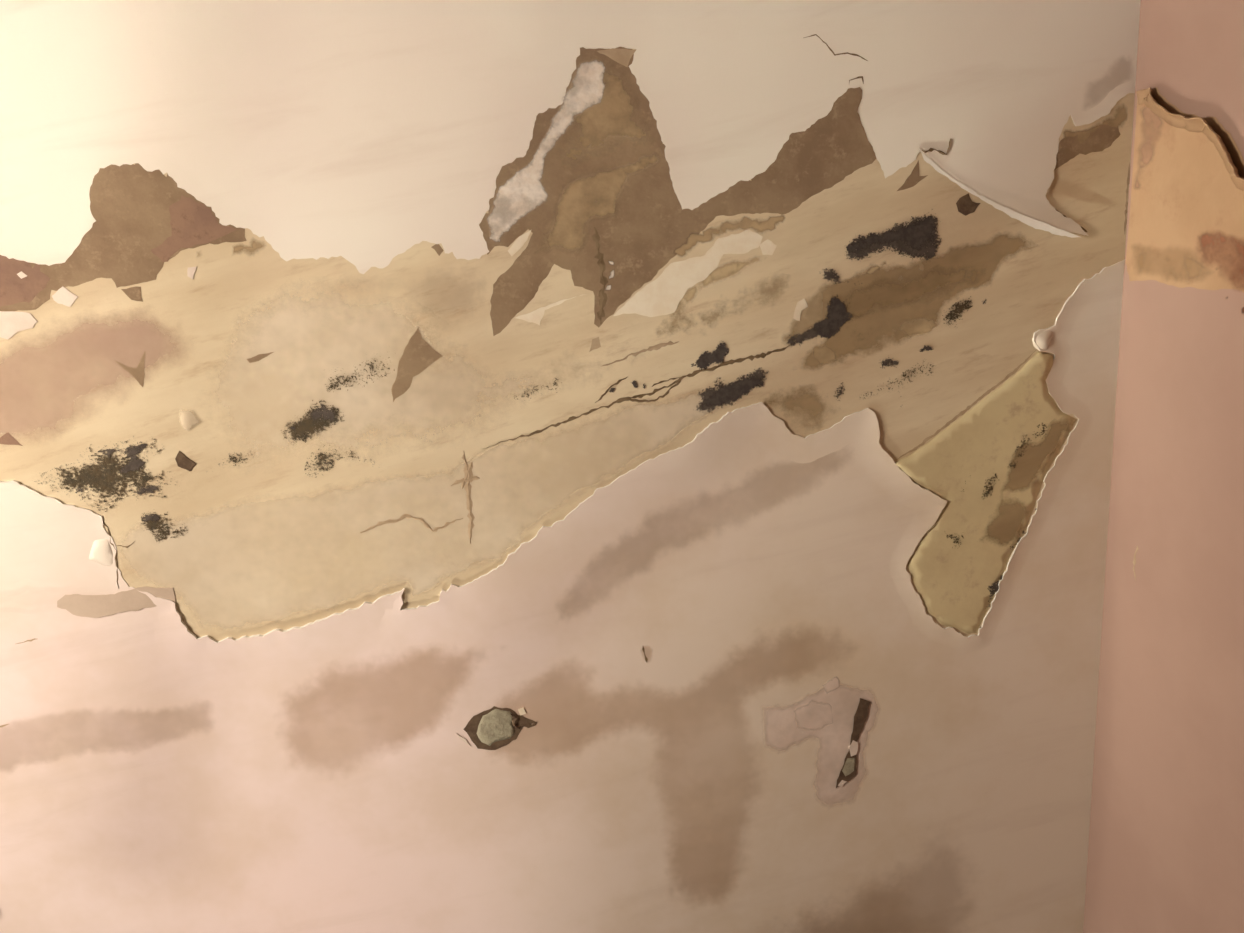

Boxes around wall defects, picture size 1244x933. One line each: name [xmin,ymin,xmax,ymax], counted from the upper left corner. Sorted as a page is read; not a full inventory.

crack [804,34,867,84]
leakage [846,212,941,262]
leakage [787,268,852,346]
leakage [942,296,986,327]
peeling [0,22,1244,684]
leakage [35,436,196,512]
crack [360,341,794,543]
leakage [141,512,189,542]
flaking render [457,706,537,750]
flaking render [836,698,870,788]